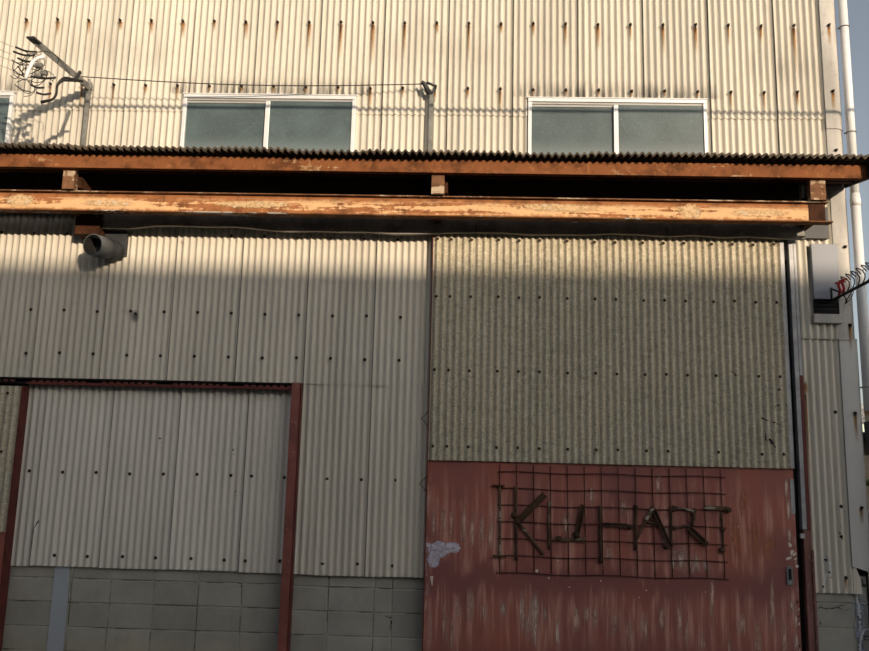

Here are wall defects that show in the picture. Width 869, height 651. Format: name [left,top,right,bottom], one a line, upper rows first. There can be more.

peeling [426,509,493,585]